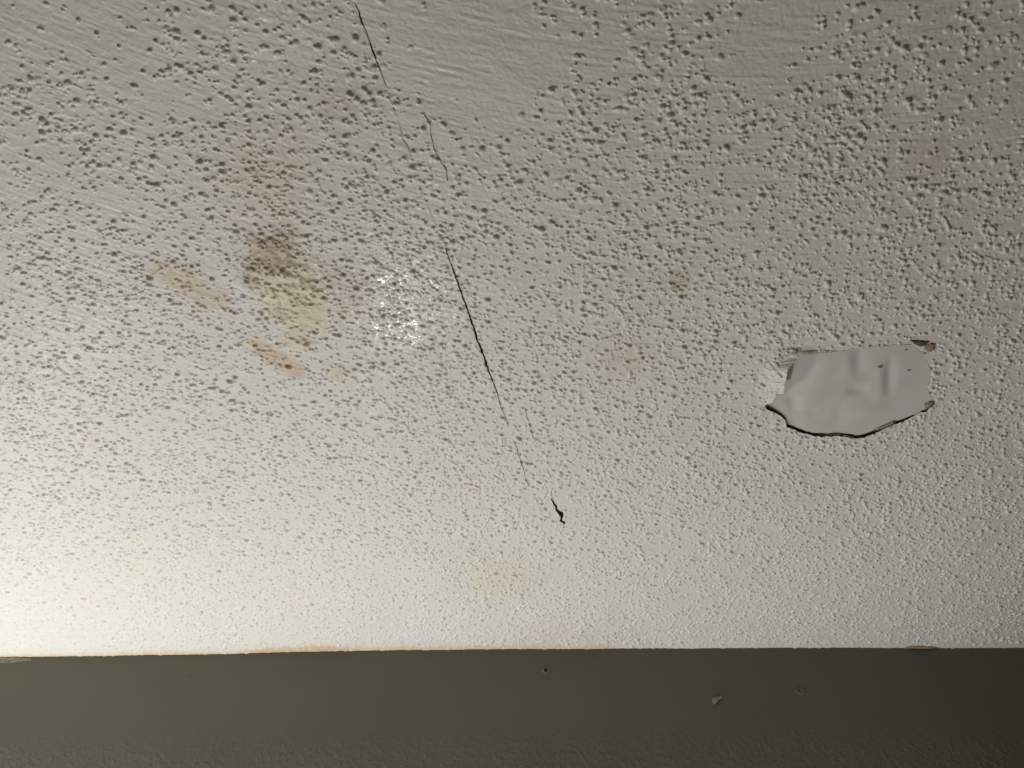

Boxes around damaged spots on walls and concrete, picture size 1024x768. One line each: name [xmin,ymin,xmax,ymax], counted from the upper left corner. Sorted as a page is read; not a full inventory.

crack [354,3,395,111]
crack [402,115,448,181]
leakage [137,68,385,384]
crack [445,249,565,529]
peeling [758,340,935,439]